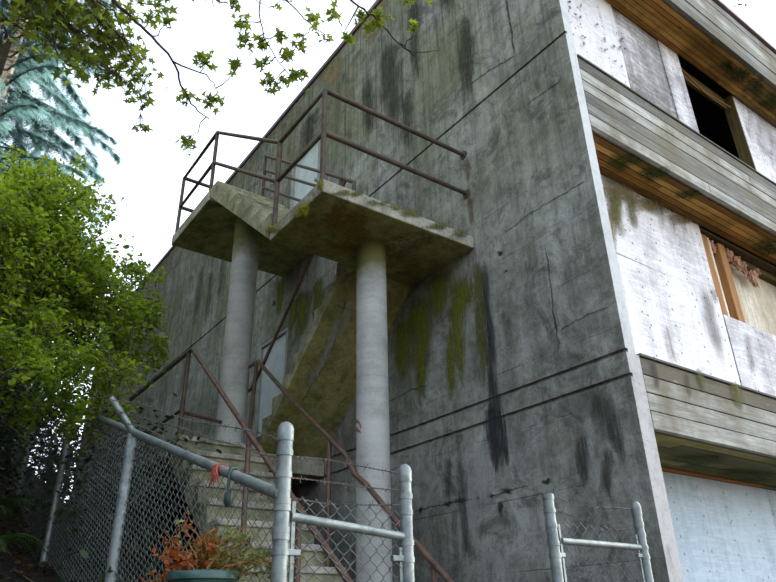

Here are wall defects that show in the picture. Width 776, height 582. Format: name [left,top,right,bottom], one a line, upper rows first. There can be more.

crack [471,0,515,84]
water stain [394,272,451,397]
crack [546,252,608,357]
water stain [447,268,509,545]
water stain [576,394,623,494]